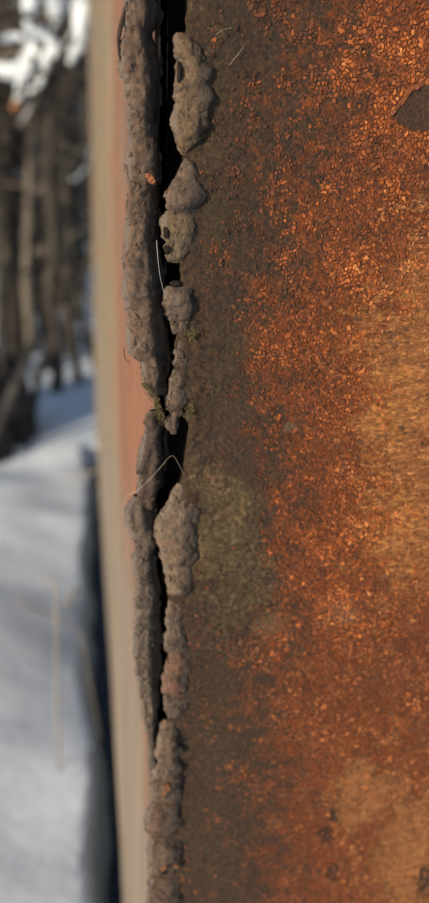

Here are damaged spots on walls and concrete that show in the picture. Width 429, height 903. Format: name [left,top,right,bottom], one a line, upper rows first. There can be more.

crack [164,0,187,211]
crack [164,240,181,286]
rust [122,343,154,500]
crack [161,320,189,508]
rust [161,0,429,903]
crack [159,560,168,722]